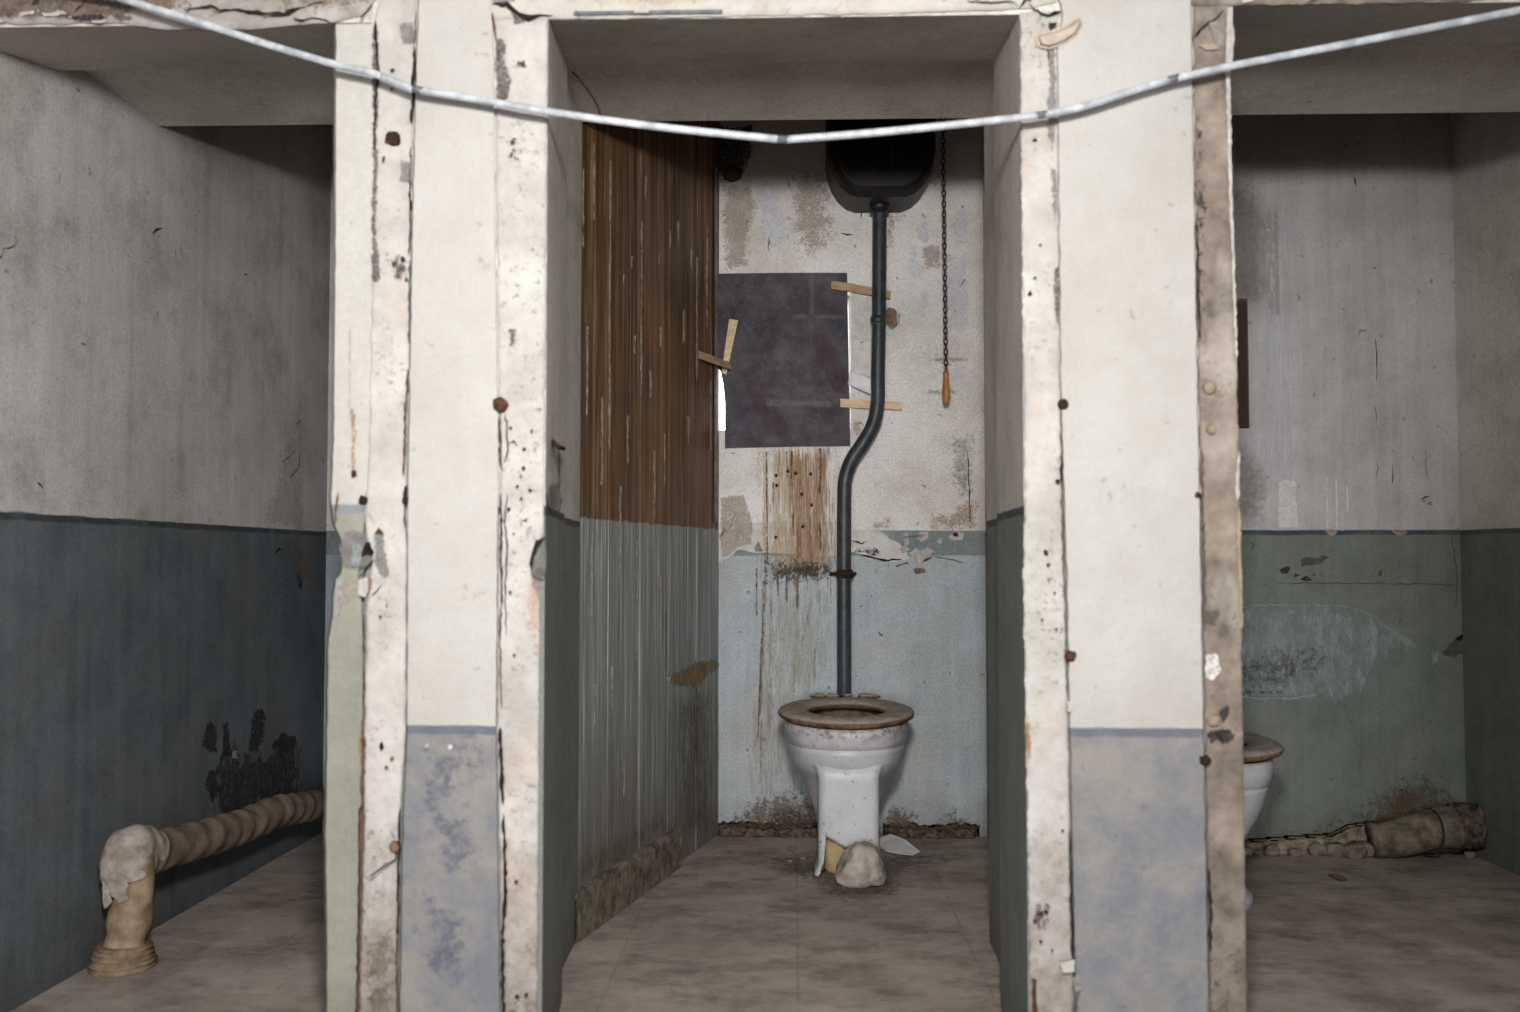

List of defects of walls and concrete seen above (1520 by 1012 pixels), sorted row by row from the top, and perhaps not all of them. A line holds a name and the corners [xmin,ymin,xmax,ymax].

flaking render [0,0,417,1012]
crack [184,1,333,25]
flaking render [490,0,1082,1012]
rust [756,448,829,737]
flaking render [1191,0,1482,1012]